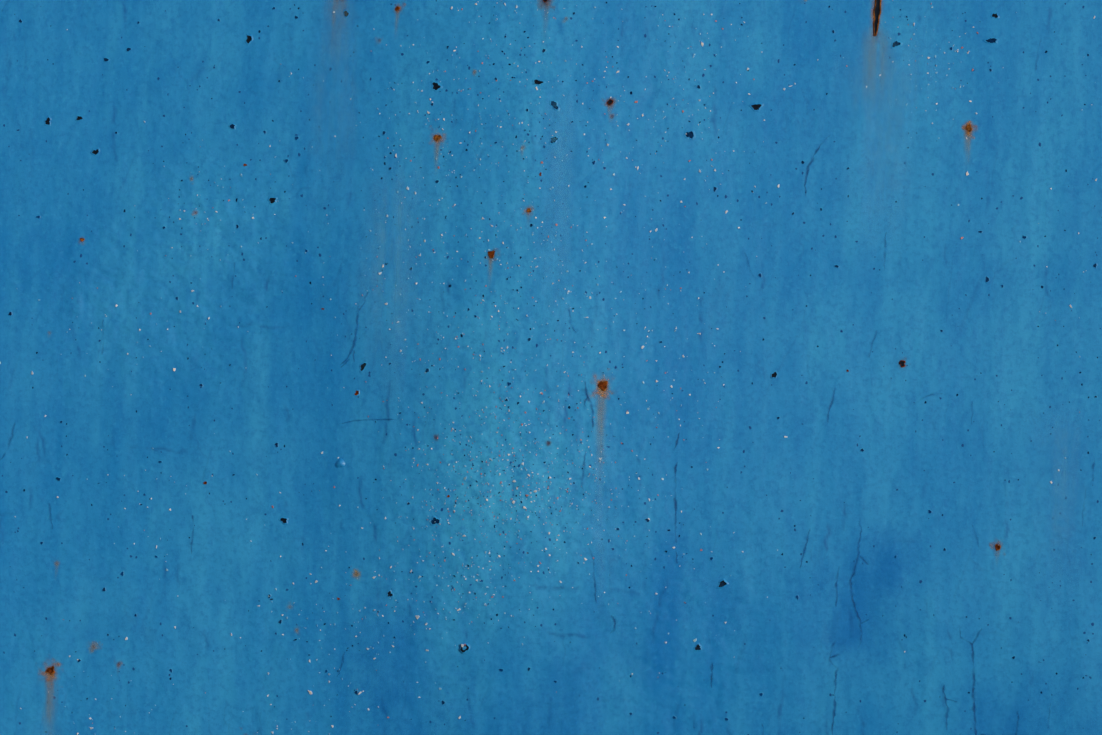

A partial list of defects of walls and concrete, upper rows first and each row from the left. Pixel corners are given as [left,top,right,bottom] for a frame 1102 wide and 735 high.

corrosion [598,380,608,396]